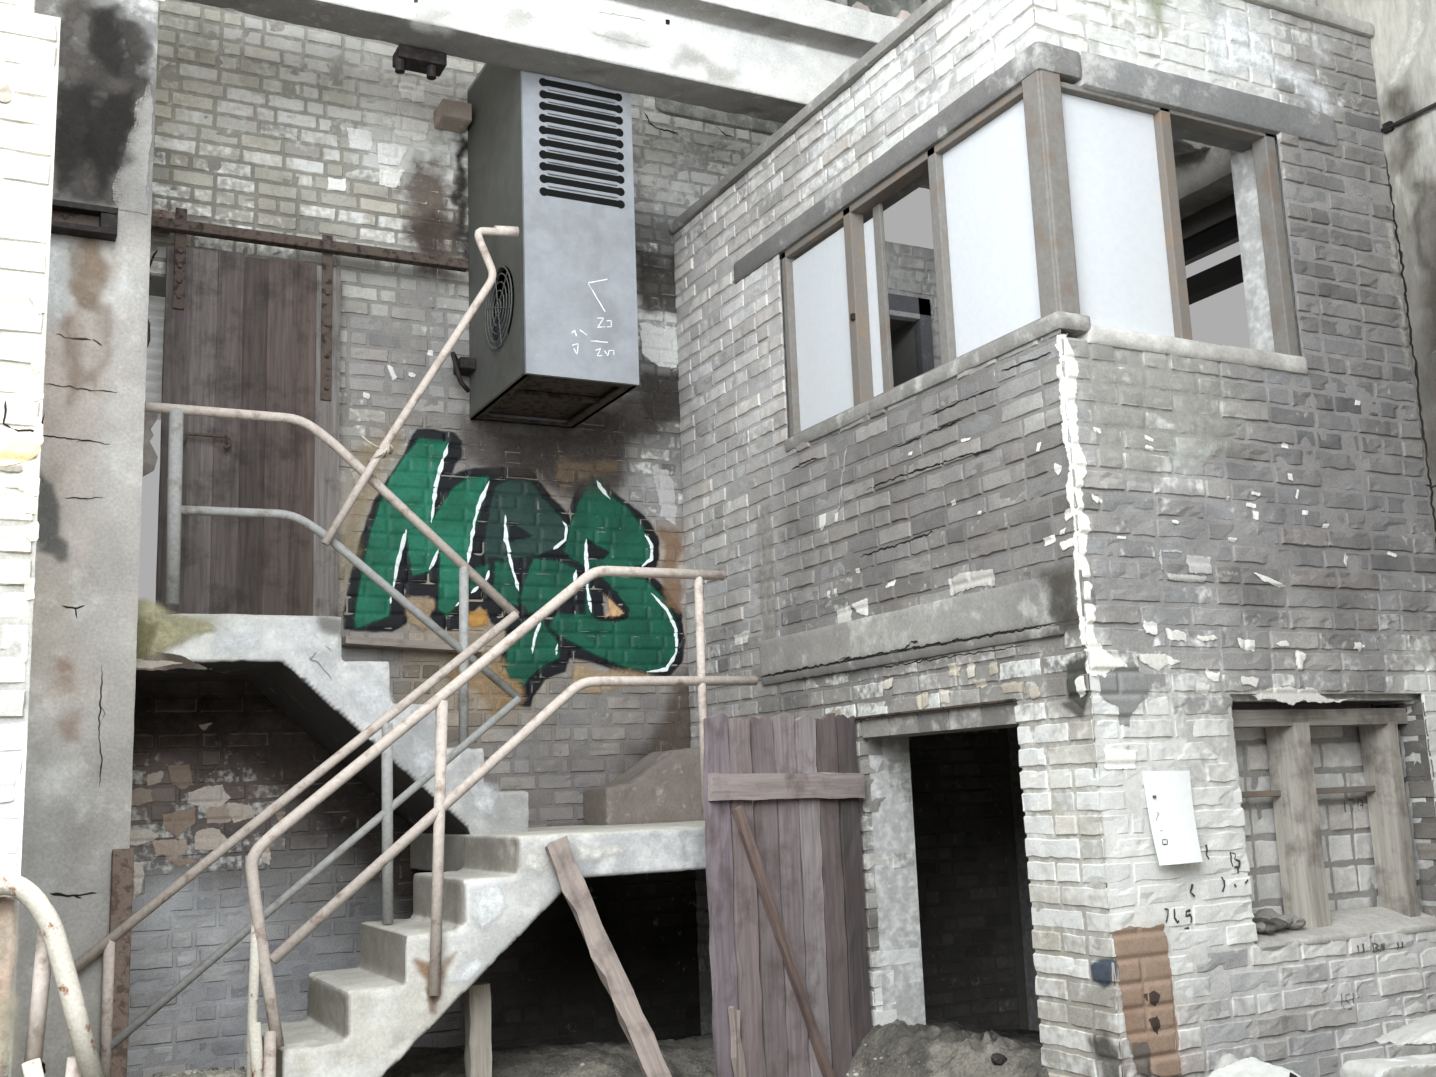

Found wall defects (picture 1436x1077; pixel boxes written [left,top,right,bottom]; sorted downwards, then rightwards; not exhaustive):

peeling [29,289,47,314]
peeling [21,341,46,401]
peeling [0,423,43,541]
leakage [37,475,67,560]
peeling [1043,334,1220,698]
peeling [1225,491,1260,520]
peeling [23,578,35,600]
peeling [1255,573,1286,587]
peeling [1237,638,1255,651]
peeling [1276,640,1306,670]
peeling [1241,676,1354,705]
flaking render [130,765,255,898]